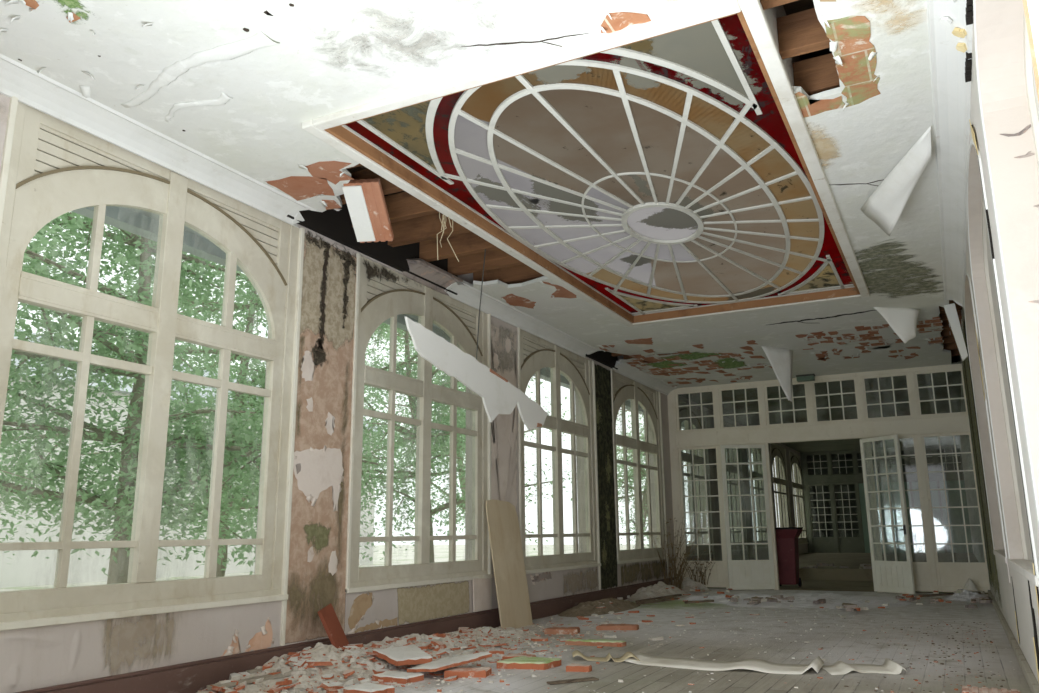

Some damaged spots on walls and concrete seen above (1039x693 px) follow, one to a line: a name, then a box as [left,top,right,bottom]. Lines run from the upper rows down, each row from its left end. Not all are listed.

peeling [0,0,39,32]
water stain [352,17,440,56]
flaking render [795,16,881,118]
flaking render [264,161,354,211]
peeling [860,126,931,236]
water stain [847,242,944,298]
flaking render [597,307,944,402]
crack [972,124,1039,682]
flaking render [220,318,398,657]